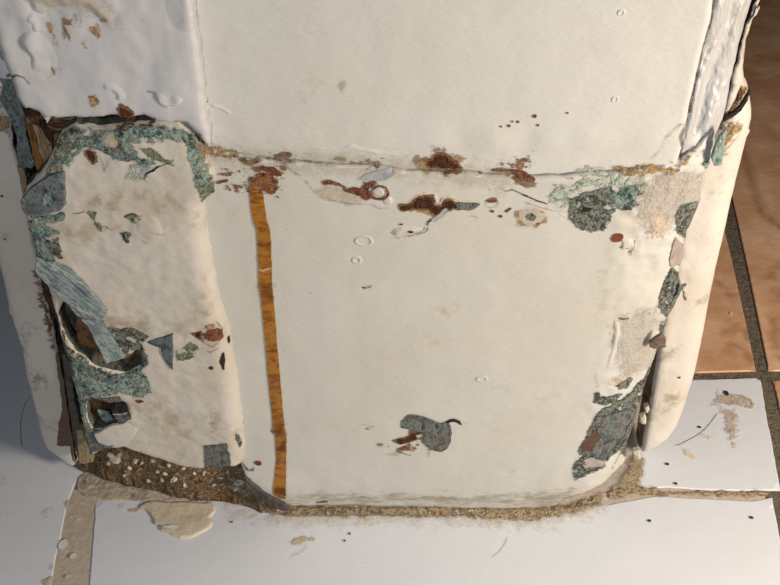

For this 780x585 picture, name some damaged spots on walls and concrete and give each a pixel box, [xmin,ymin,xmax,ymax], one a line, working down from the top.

rust [47,17,77,44]
rust [0,78,35,168]
crack [250,156,323,167]
rust [492,151,536,188]
rust [28,187,65,262]
peeling [635,172,704,234]
peeling [34,237,125,364]
rust [44,103,297,499]
peeling [147,333,173,370]
spalling [191,323,224,353]
peeling [617,306,659,374]
spalling [388,415,462,456]